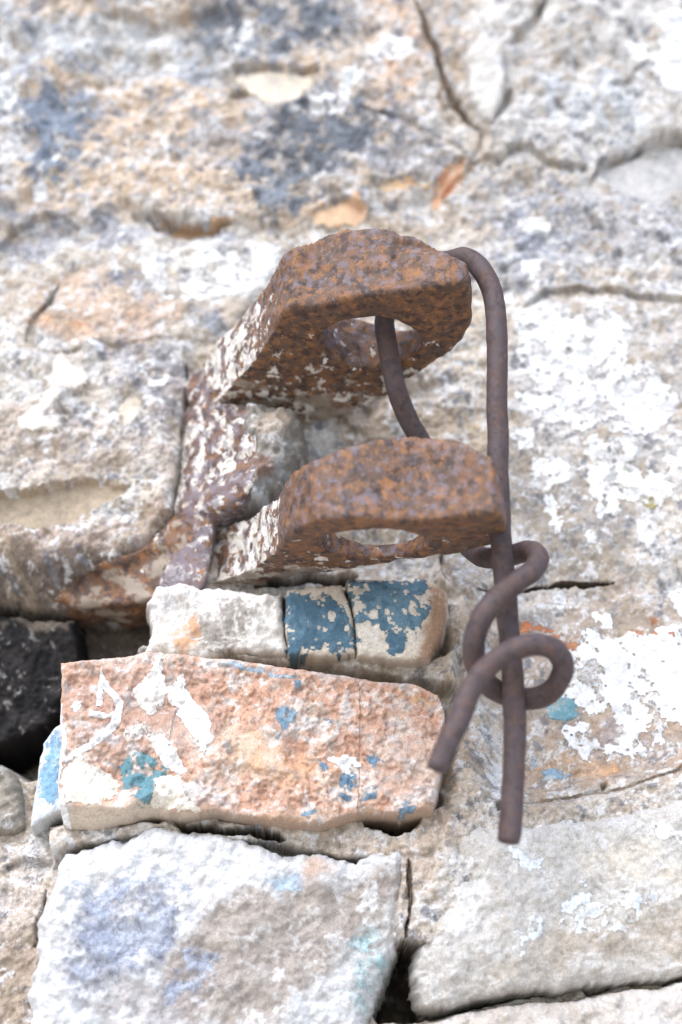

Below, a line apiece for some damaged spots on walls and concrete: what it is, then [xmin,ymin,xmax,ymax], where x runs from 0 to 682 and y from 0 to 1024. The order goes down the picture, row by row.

crack [363,0,481,155]
peeling [516,214,551,235]
peeling [520,258,544,276]
peeling [504,289,682,556]
crack [523,581,615,593]
peeling [218,578,432,689]
rust [520,621,598,659]
rust [630,617,675,637]
peeling [546,588,682,763]
peeling [38,652,215,830]
peeling [320,754,384,802]
crack [524,769,682,804]